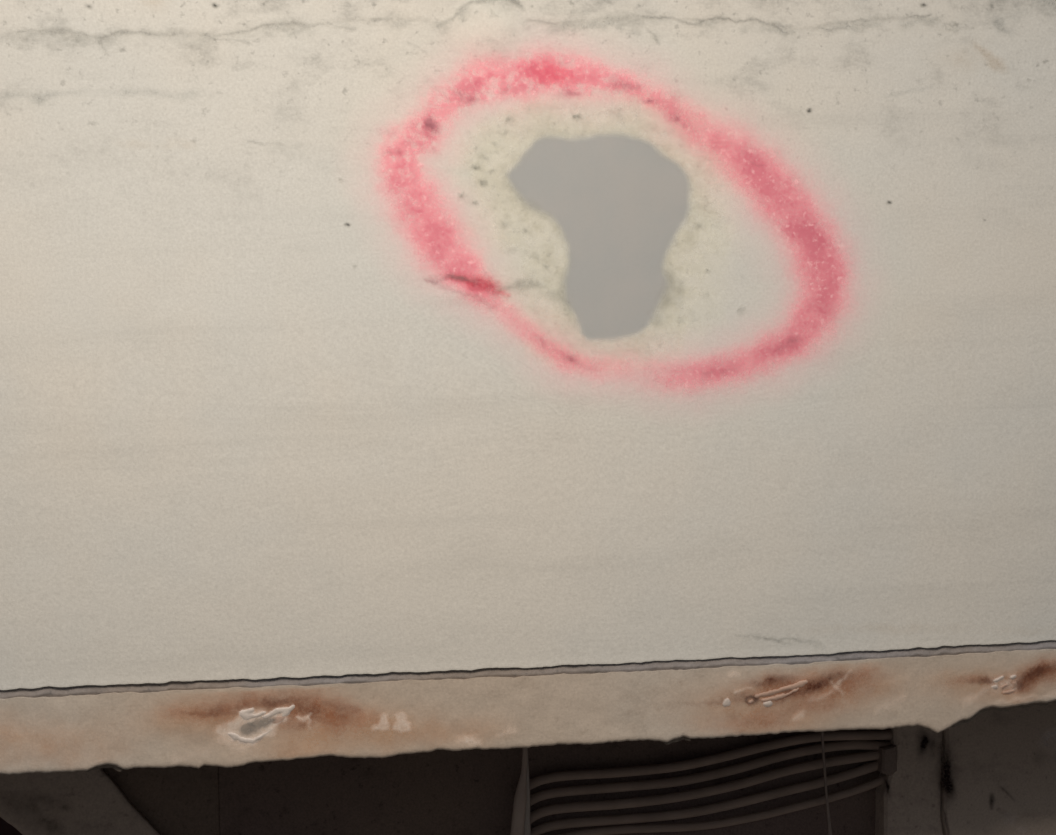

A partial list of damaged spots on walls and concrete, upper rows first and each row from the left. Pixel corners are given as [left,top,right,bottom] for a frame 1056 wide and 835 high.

spalling [474,104,714,360]
rust [767,677,847,697]
rust [1017,663,1055,690]
spalling [216,704,296,746]